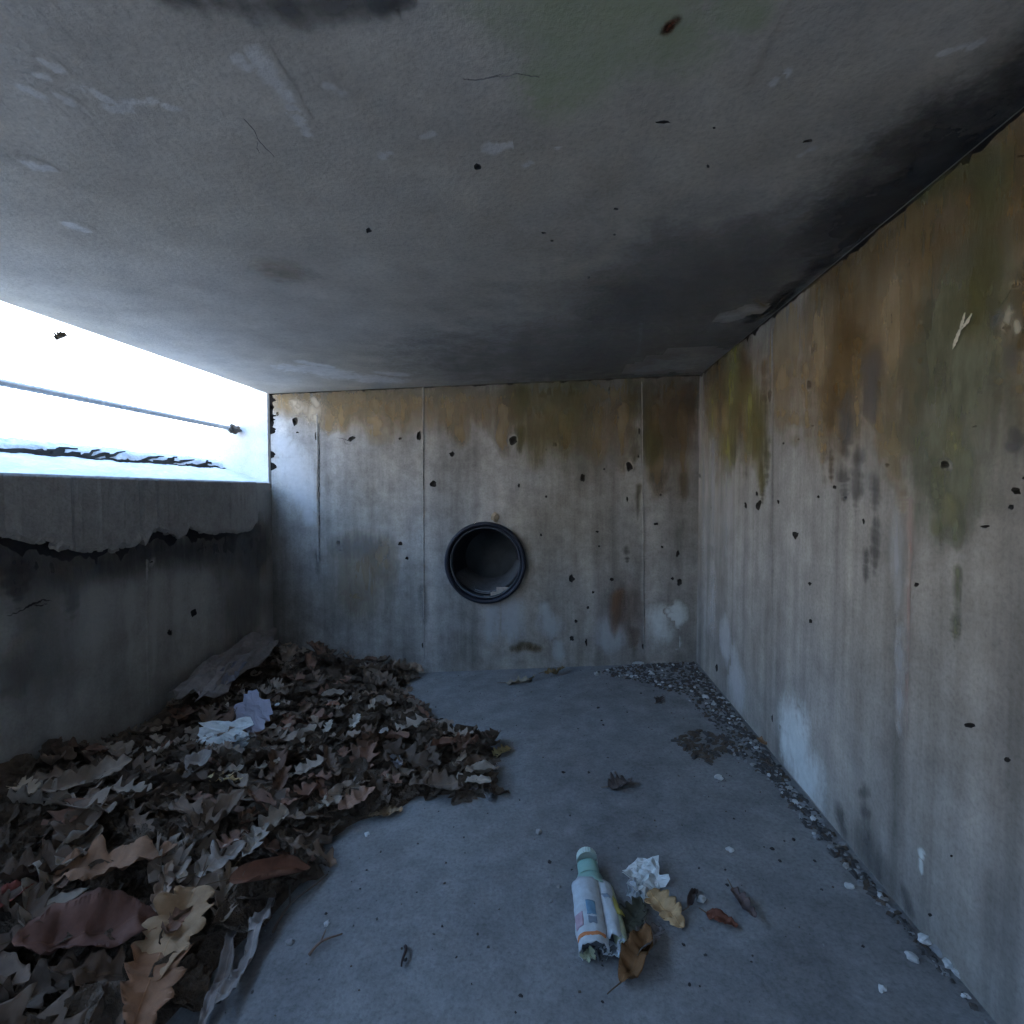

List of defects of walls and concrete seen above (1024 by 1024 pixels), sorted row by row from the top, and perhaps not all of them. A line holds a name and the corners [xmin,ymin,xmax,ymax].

leakage [252,43,1024,500]
leakage [271,430,338,530]
peeling [35,536,71,552]
leakage [476,587,574,667]
leakage [587,596,690,666]